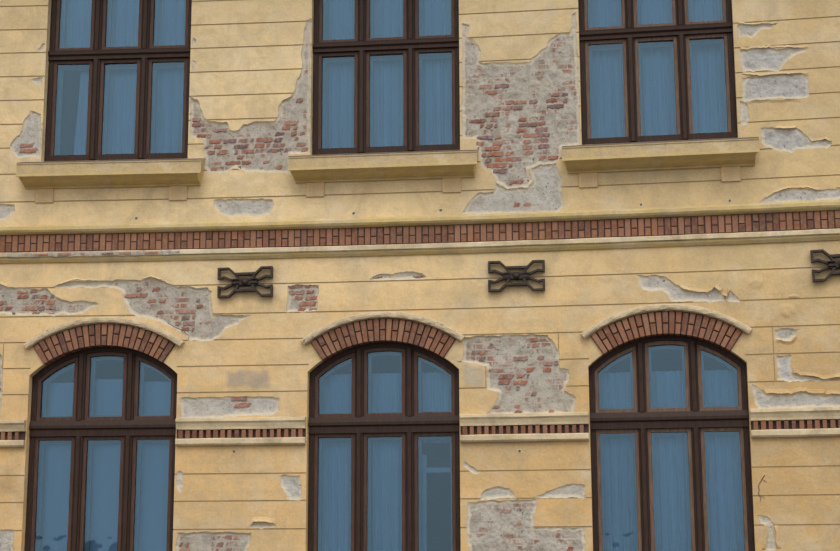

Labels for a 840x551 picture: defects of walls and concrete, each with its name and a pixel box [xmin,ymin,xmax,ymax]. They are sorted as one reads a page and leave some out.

flaking render [10,111,42,158]
flaking render [189,19,312,174]
flaking render [461,12,581,214]
flaking render [737,21,809,126]
flaking render [760,185,840,203]
flaking render [0,275,251,341]
flaking render [286,284,319,312]
flaking render [638,275,740,303]
flaking render [462,334,576,414]
flaking render [752,355,840,409]
flaking render [0,529,15,551]
flaking render [466,484,586,551]